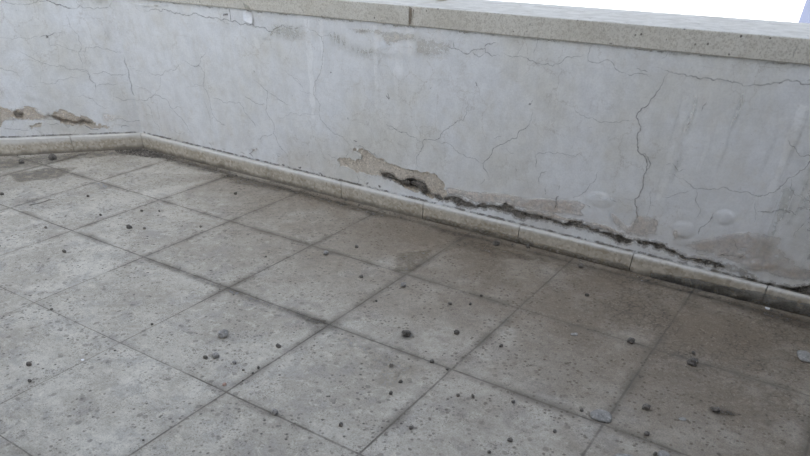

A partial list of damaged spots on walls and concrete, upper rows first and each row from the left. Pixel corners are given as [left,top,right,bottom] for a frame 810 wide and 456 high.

flaking render [0,106,109,129]
flaking render [337,148,810,296]